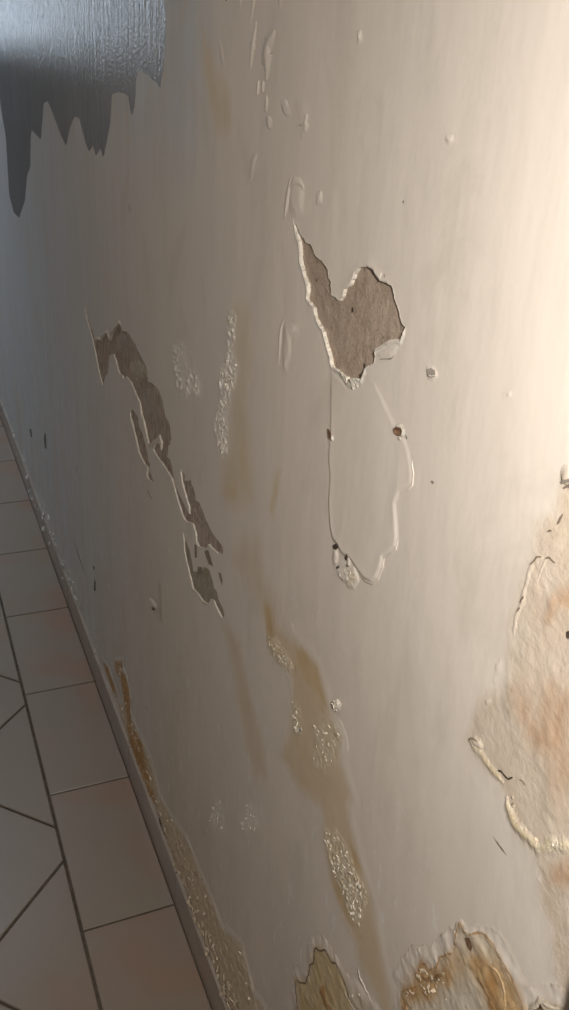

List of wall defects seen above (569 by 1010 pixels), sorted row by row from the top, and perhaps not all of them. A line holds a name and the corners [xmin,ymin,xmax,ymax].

peeling [293,218,406,390]
peeling [85,309,225,618]
damp [171,277,569,1010]